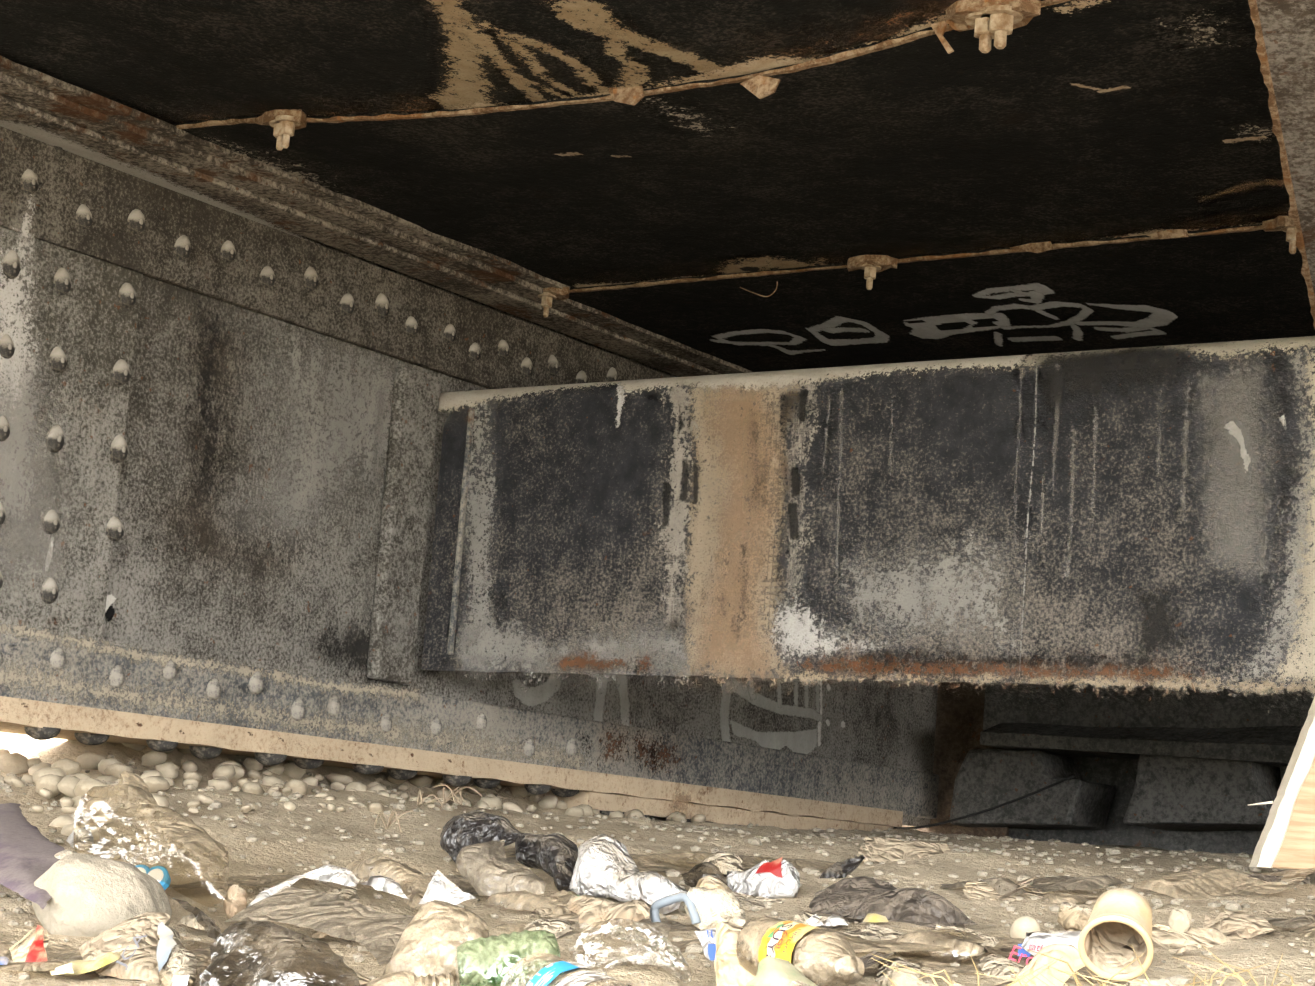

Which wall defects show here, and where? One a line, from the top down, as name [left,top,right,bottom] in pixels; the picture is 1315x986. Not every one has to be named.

water stain [437,336,1315,697]
corrosion [675,382,1315,708]